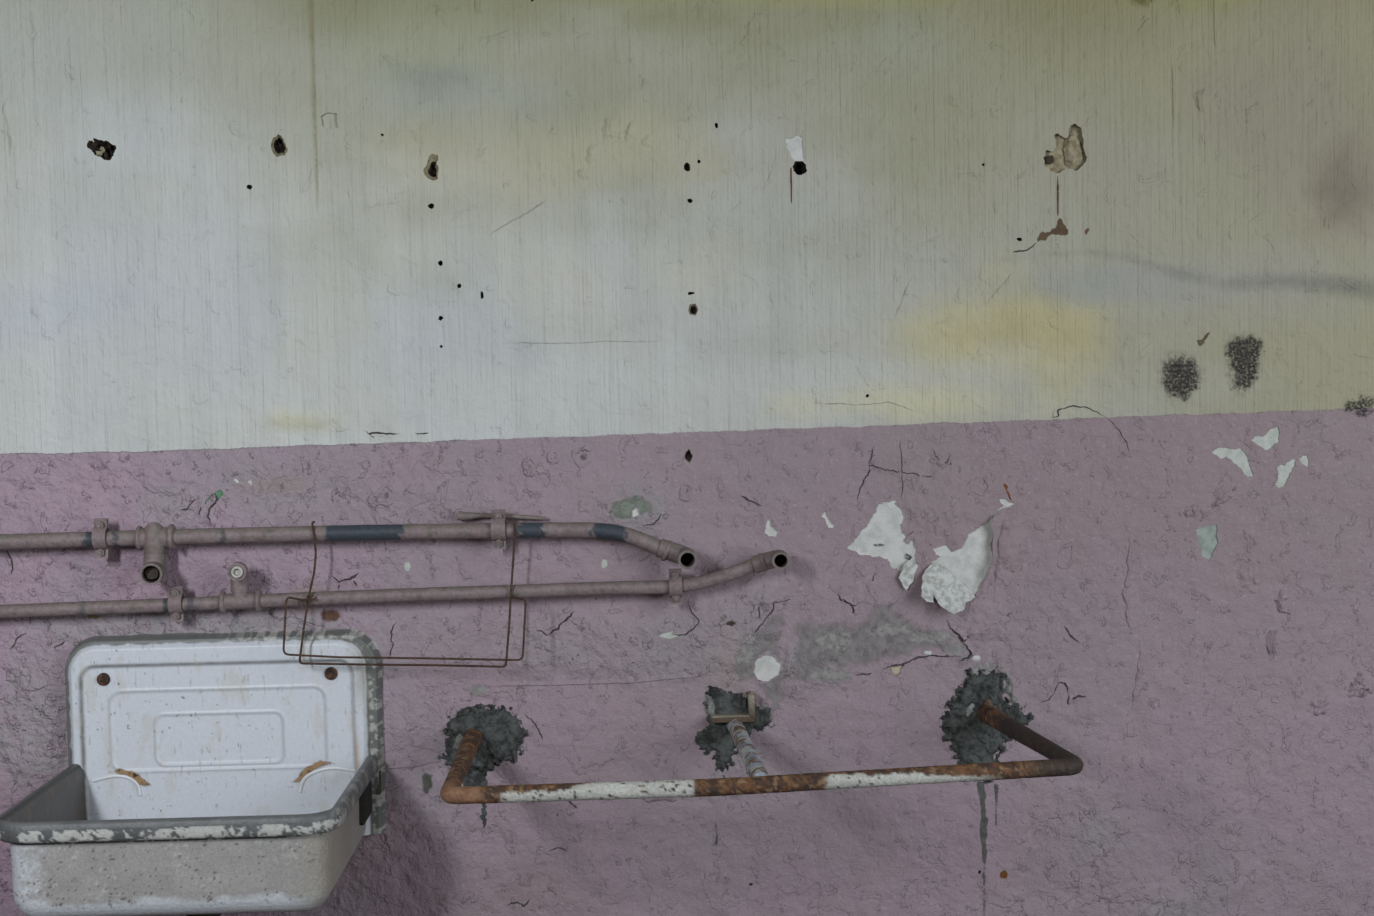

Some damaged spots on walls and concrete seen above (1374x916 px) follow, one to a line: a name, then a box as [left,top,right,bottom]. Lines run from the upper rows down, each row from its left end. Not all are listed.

flaking render [1044,124,1087,214]
corrosion [1012,218,1068,253]
damp [1163,358,1197,401]
damp [1226,336,1263,387]
peeling [1212,427,1280,477]
peeling [1275,455,1309,488]
peeling [765,517,778,537]
peeling [848,484,1016,614]
peeling [1196,525,1218,560]
peeling [754,655,781,682]